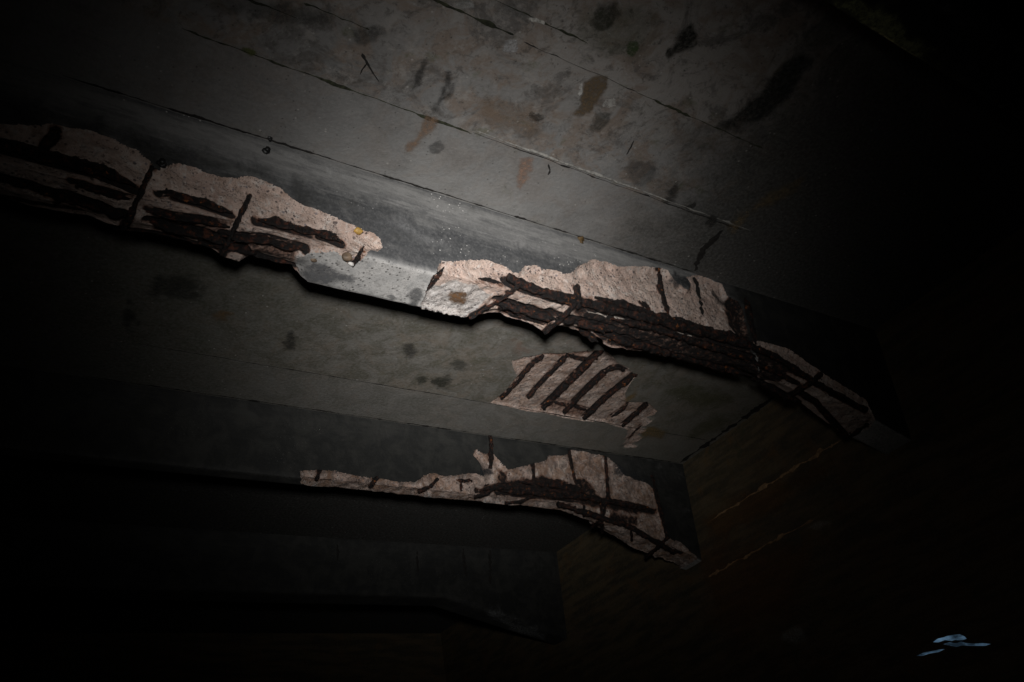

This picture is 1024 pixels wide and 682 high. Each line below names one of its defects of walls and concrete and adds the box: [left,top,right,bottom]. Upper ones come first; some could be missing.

spalling [0,123,383,276]
spalling [420,259,875,448]
spalling [300,435,697,569]